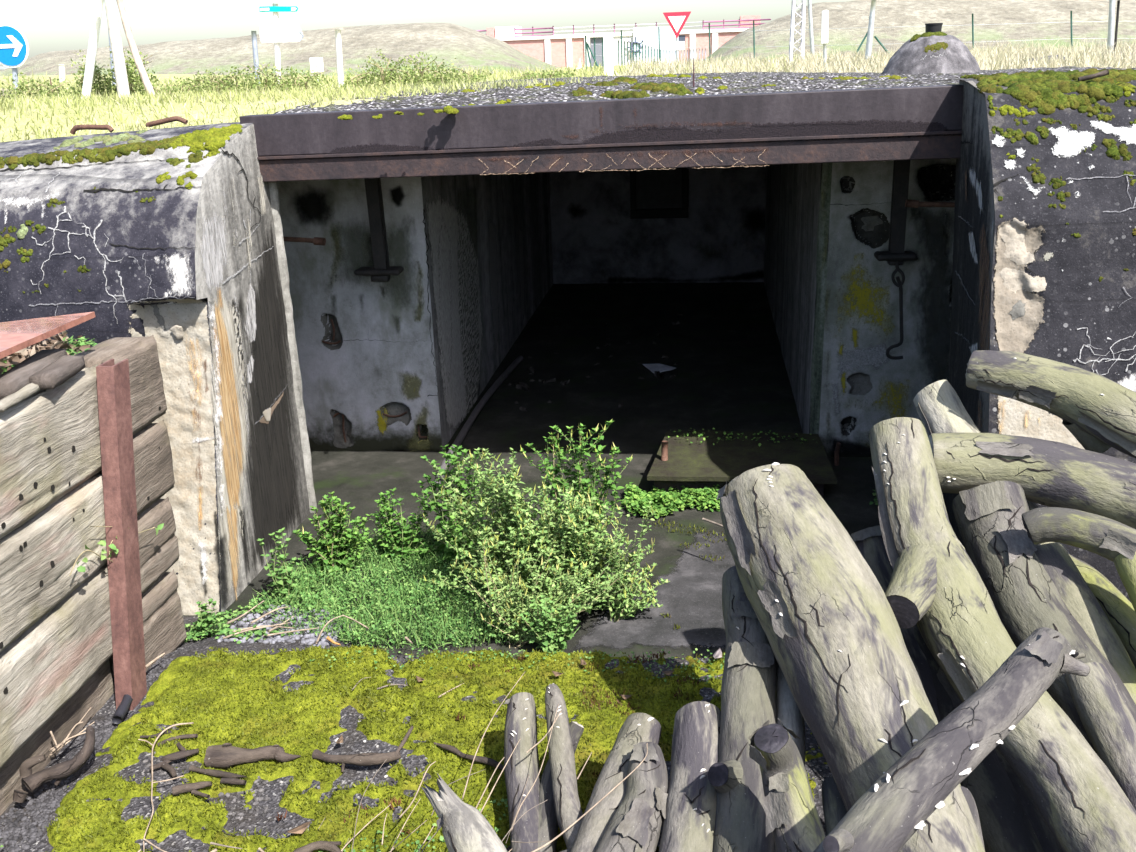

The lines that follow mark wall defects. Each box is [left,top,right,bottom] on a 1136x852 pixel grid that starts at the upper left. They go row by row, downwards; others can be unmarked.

corrosion [479,107,954,175]
crack [1067,174,1136,212]
crack [0,147,274,319]
water stain [294,189,374,306]
spalling [321,313,343,350]
water stain [382,186,499,429]
spalling [993,218,1047,353]
crack [1073,328,1136,375]
spalling [128,299,220,615]
spalling [380,402,428,441]
water stain [832,439,871,457]
water stain [872,382,911,418]